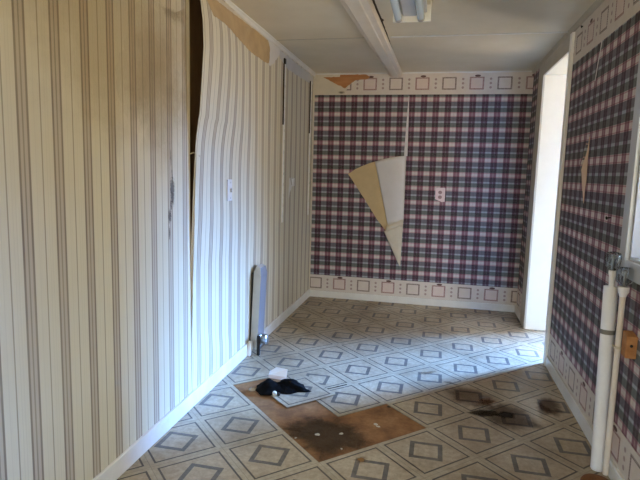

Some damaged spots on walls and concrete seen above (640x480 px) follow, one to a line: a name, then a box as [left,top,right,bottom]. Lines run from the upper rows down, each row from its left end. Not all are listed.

peeling [207,0,370,95]
peeling [234,378,425,462]